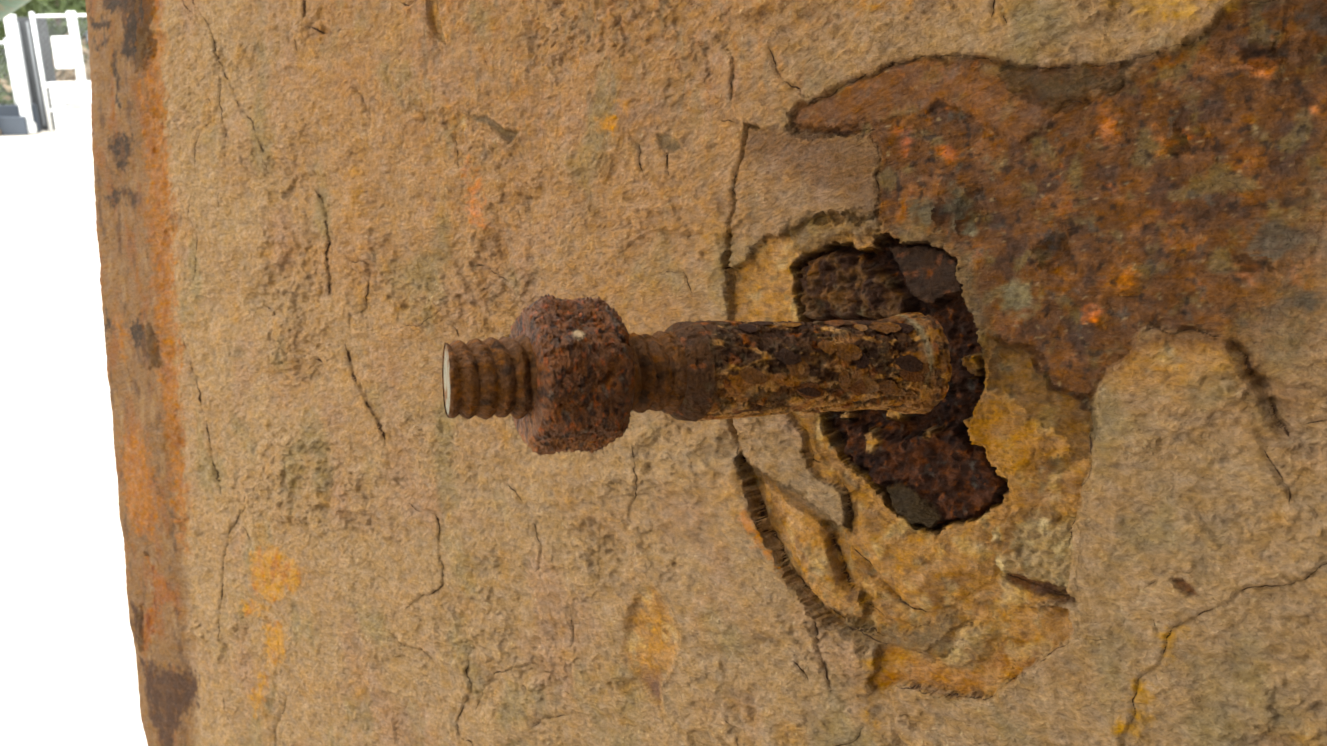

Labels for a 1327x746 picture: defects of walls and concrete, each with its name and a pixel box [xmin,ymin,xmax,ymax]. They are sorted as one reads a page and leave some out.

crack [183,0,268,171]
rust [1075,0,1259,63]
crack [317,193,369,303]
rust [105,0,199,661]
crack [316,342,385,441]
spalling [716,0,1327,710]
crack [1243,564,1326,590]
crack [457,665,508,743]